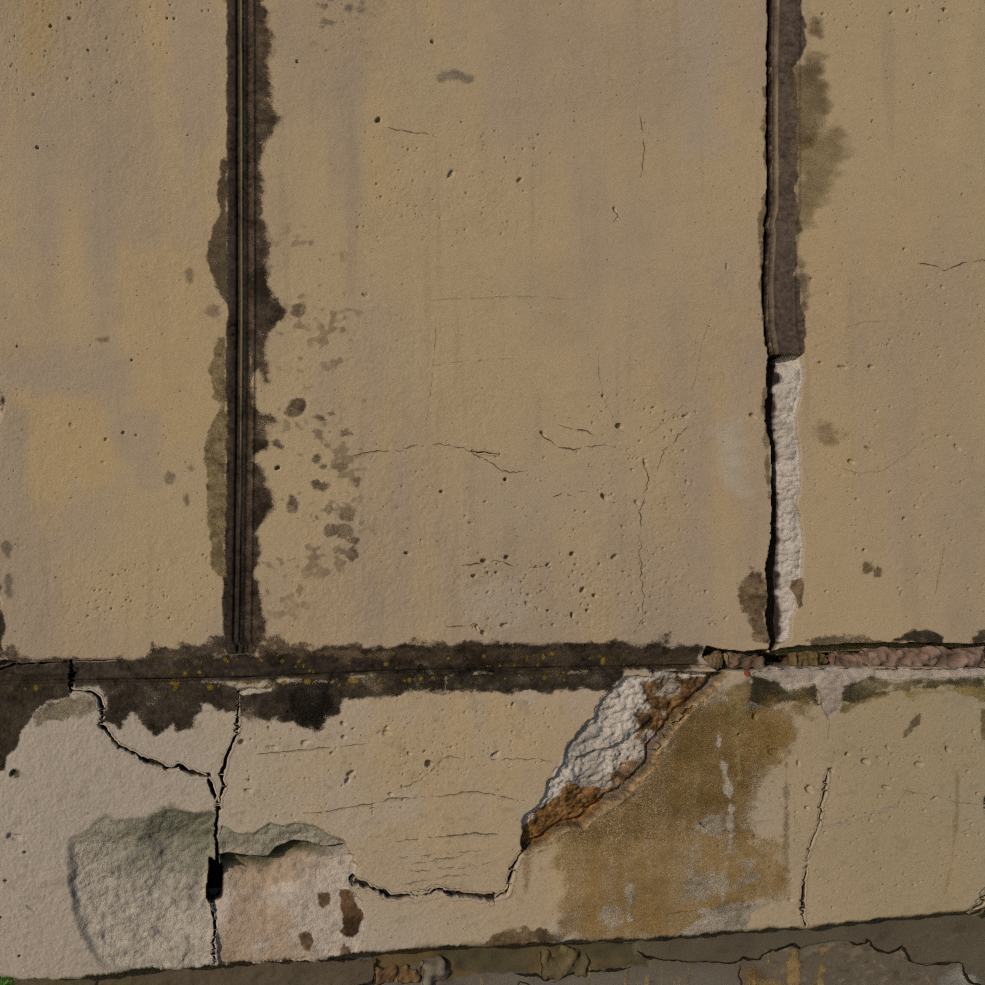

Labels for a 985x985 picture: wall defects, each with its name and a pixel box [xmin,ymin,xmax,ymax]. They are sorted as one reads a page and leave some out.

water stain [786,57,841,220]
water stain [0,0,700,770]
spalling [764,354,804,650]
crack [0,658,242,858]
crack [208,896,219,964]
spalling [69,807,365,970]
crack [353,850,526,905]
spalling [520,669,729,855]
crack [516,770,831,985]
water stain [679,676,819,936]
spalling [753,664,985,719]
water stain [841,676,985,739]